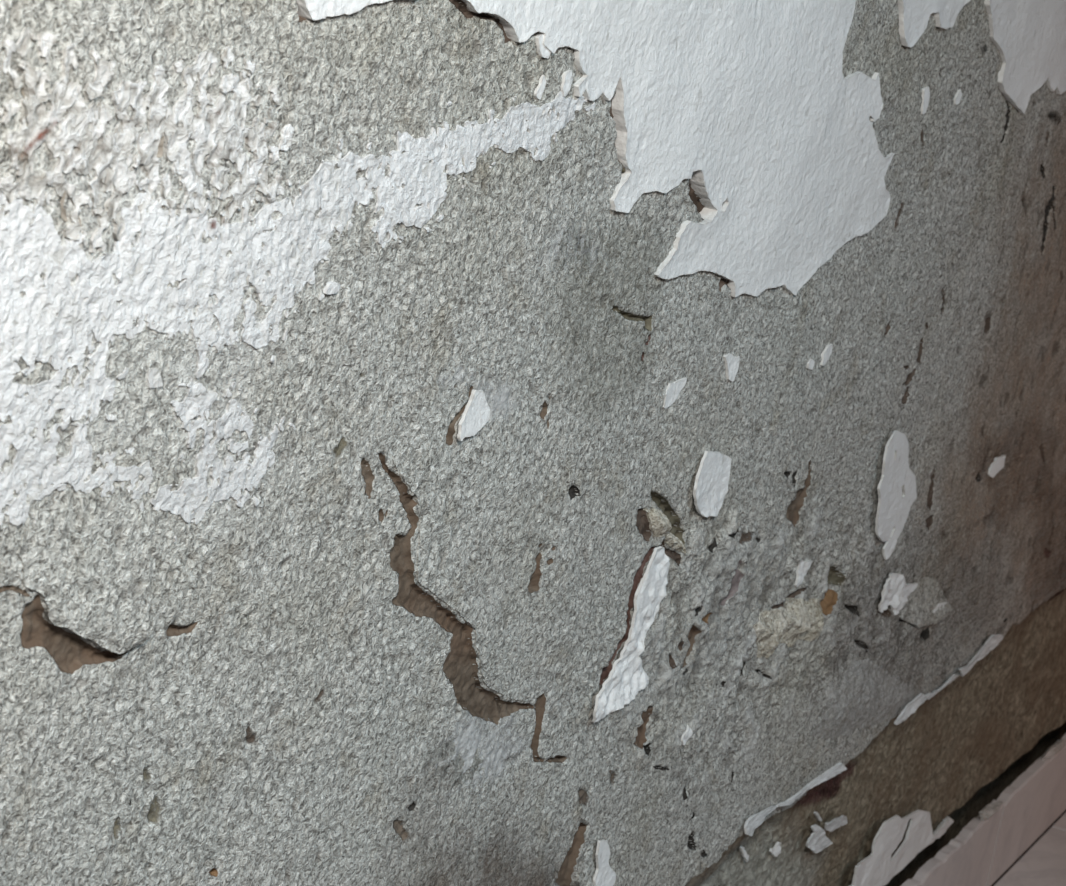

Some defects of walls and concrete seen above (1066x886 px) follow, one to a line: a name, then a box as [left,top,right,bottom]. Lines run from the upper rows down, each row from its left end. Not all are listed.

peeling [897,0,971,48]
peeling [984,0,1066,114]
peeling [0,0,895,527]
peeling [591,491,685,723]
flaking render [669,559,744,675]
flaking render [708,529,761,552]
peeling [875,430,917,560]
peeling [878,573,918,618]
peeling [975,455,1006,482]
flaking render [634,706,669,771]
flaking render [685,588,1066,886]
peeling [555,822,616,886]